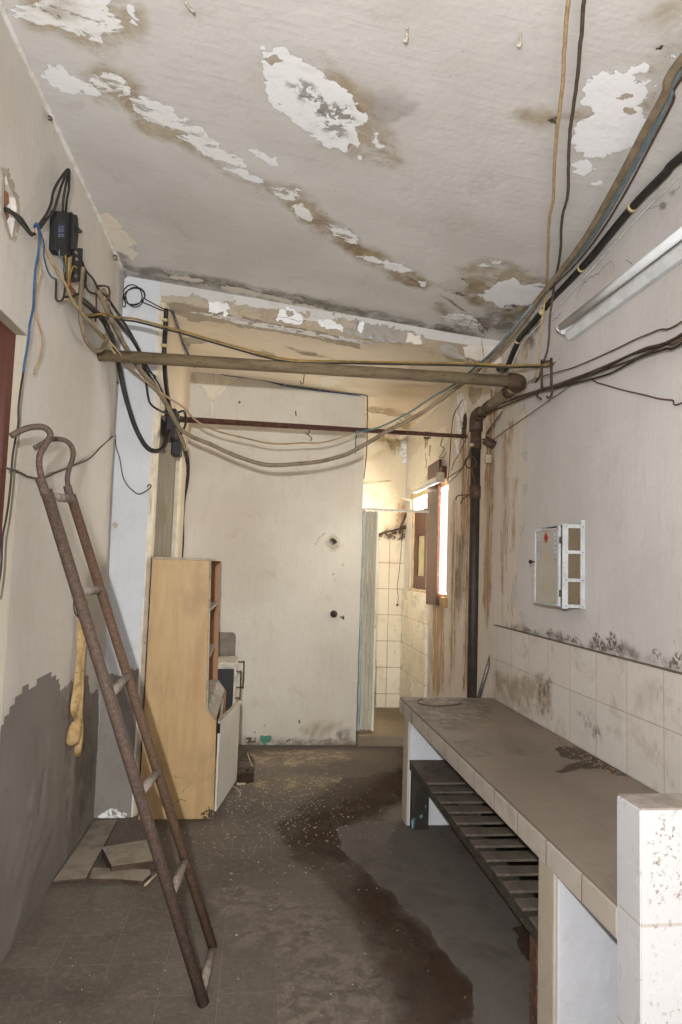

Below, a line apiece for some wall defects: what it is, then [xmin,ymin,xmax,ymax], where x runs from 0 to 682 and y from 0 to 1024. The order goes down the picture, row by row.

peeling [4,0,139,45]
peeling [40,63,279,183]
peeling [259,45,385,160]
peeling [571,57,658,185]
water stain [271,186,376,259]
water stain [126,267,366,316]
peeling [161,293,425,350]
peeling [357,254,545,311]
rust [483,411,513,624]
water stain [529,629,633,656]
water stain [556,746,628,776]
water stain [277,771,473,1024]